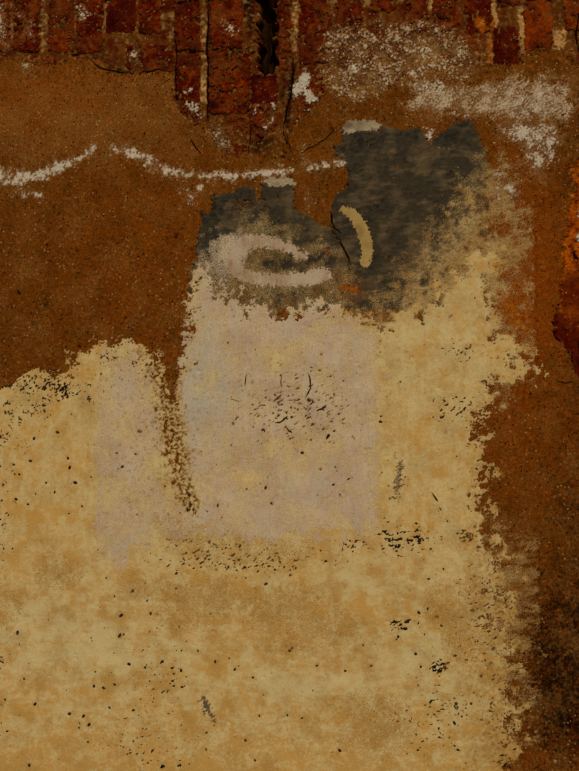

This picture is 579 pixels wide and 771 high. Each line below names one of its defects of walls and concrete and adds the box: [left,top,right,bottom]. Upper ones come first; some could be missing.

efflorescence [0,140,348,207]
spalling [0,0,579,160]
efflorescence [292,16,579,213]